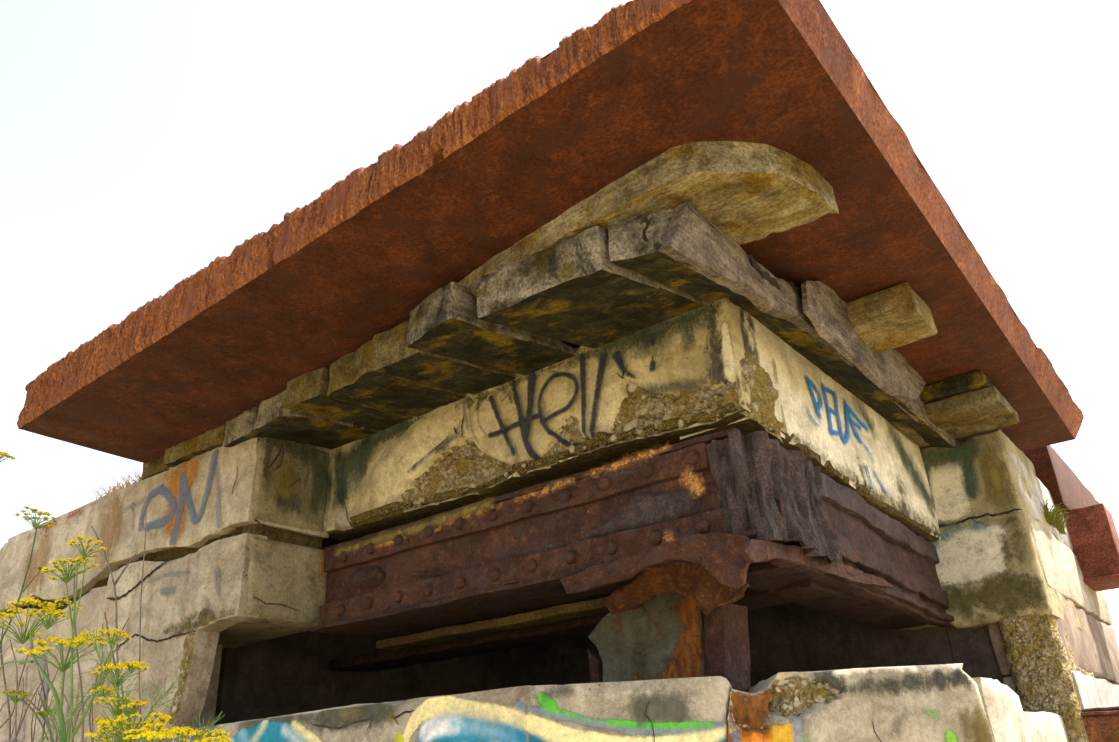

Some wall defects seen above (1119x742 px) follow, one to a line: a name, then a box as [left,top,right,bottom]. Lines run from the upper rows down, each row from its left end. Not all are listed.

rust [165,458,196,535]
damp [257,412,429,515]
spalling [350,322,785,523]
rust [706,430,940,565]
damp [945,517,1048,617]
rust [657,597,703,679]